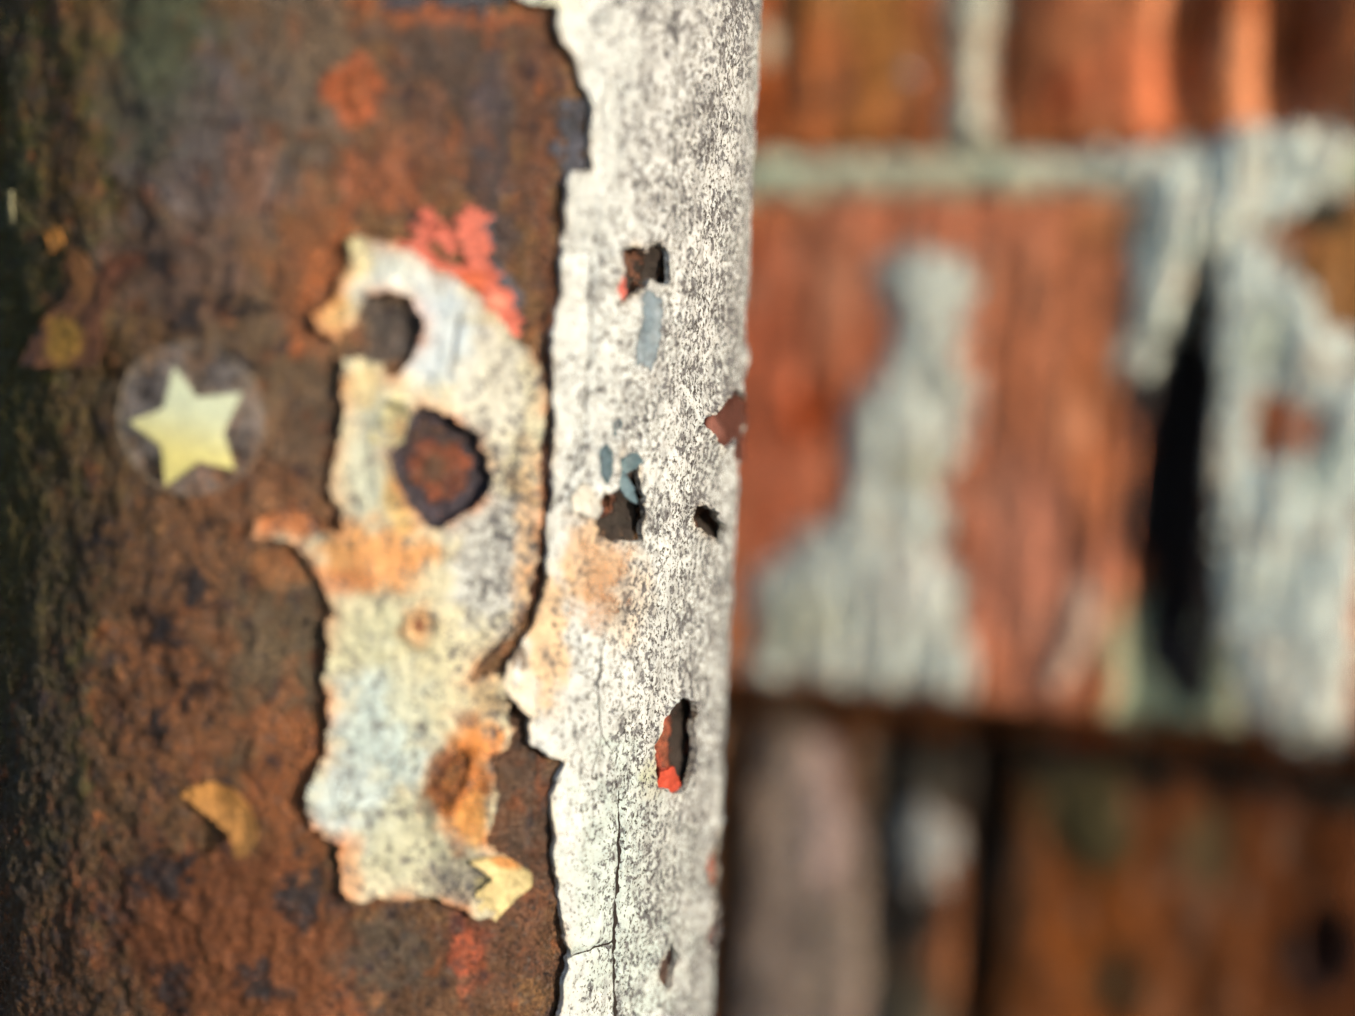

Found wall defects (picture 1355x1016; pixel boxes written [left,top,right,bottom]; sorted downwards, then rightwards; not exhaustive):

peeling [248,0,762,1016]